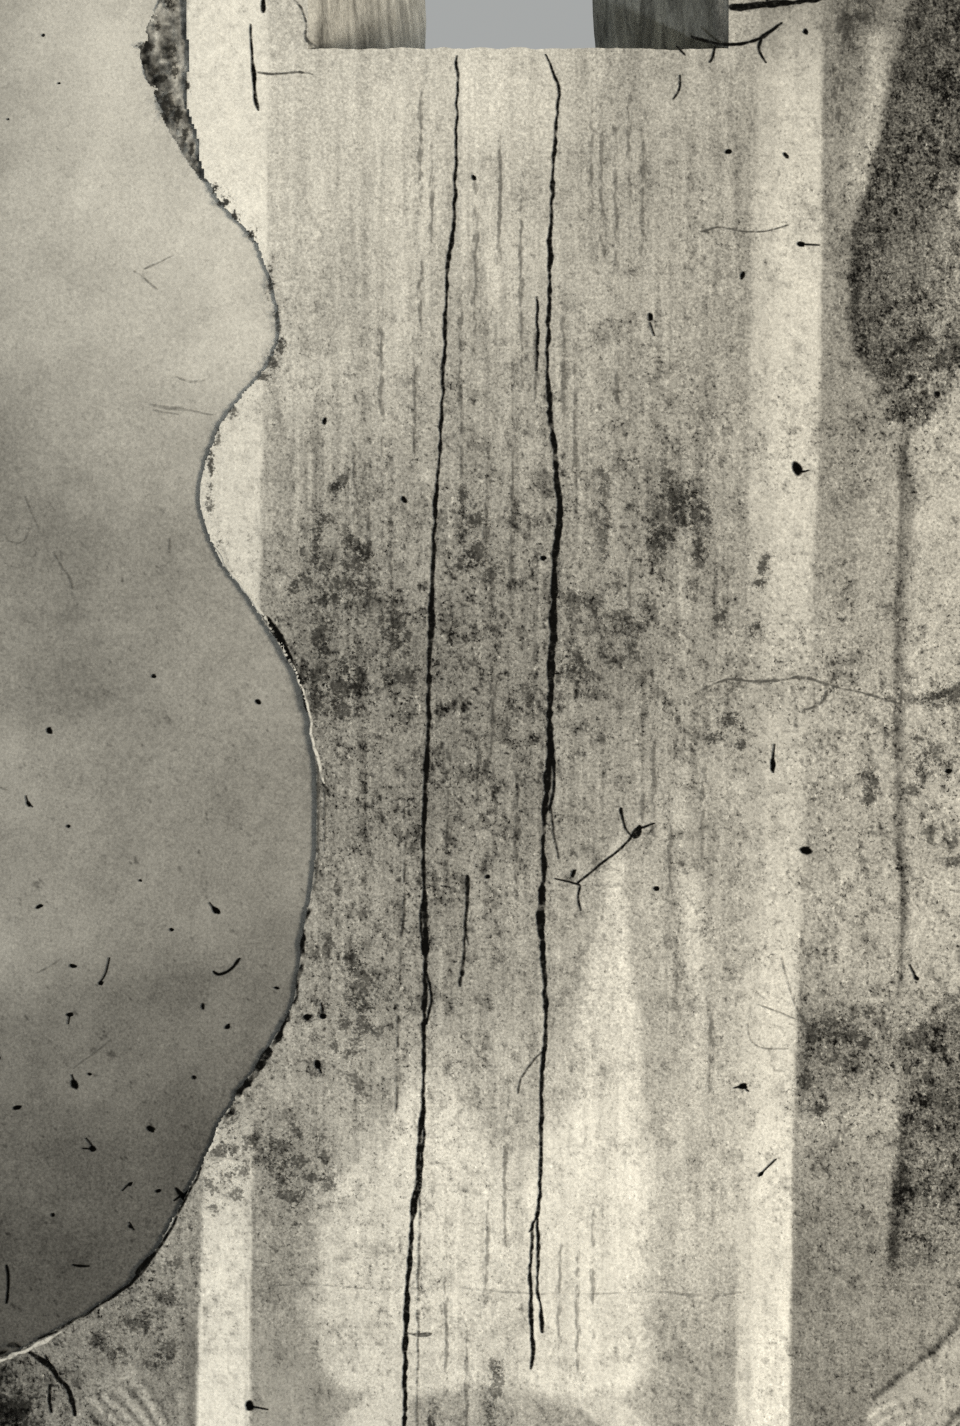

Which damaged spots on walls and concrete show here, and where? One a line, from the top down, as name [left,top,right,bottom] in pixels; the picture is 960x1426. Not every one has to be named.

crack [673,0,821,100]
spalling [136,0,258,243]
spalling [257,257,287,381]
spalling [206,407,238,512]
peeling [328,472,348,497]
peeling [213,513,421,783]
crack [396,55,470,1426]
crack [518,54,655,1369]
water stain [0,1360,44,1426]
spalling [0,1331,62,1362]